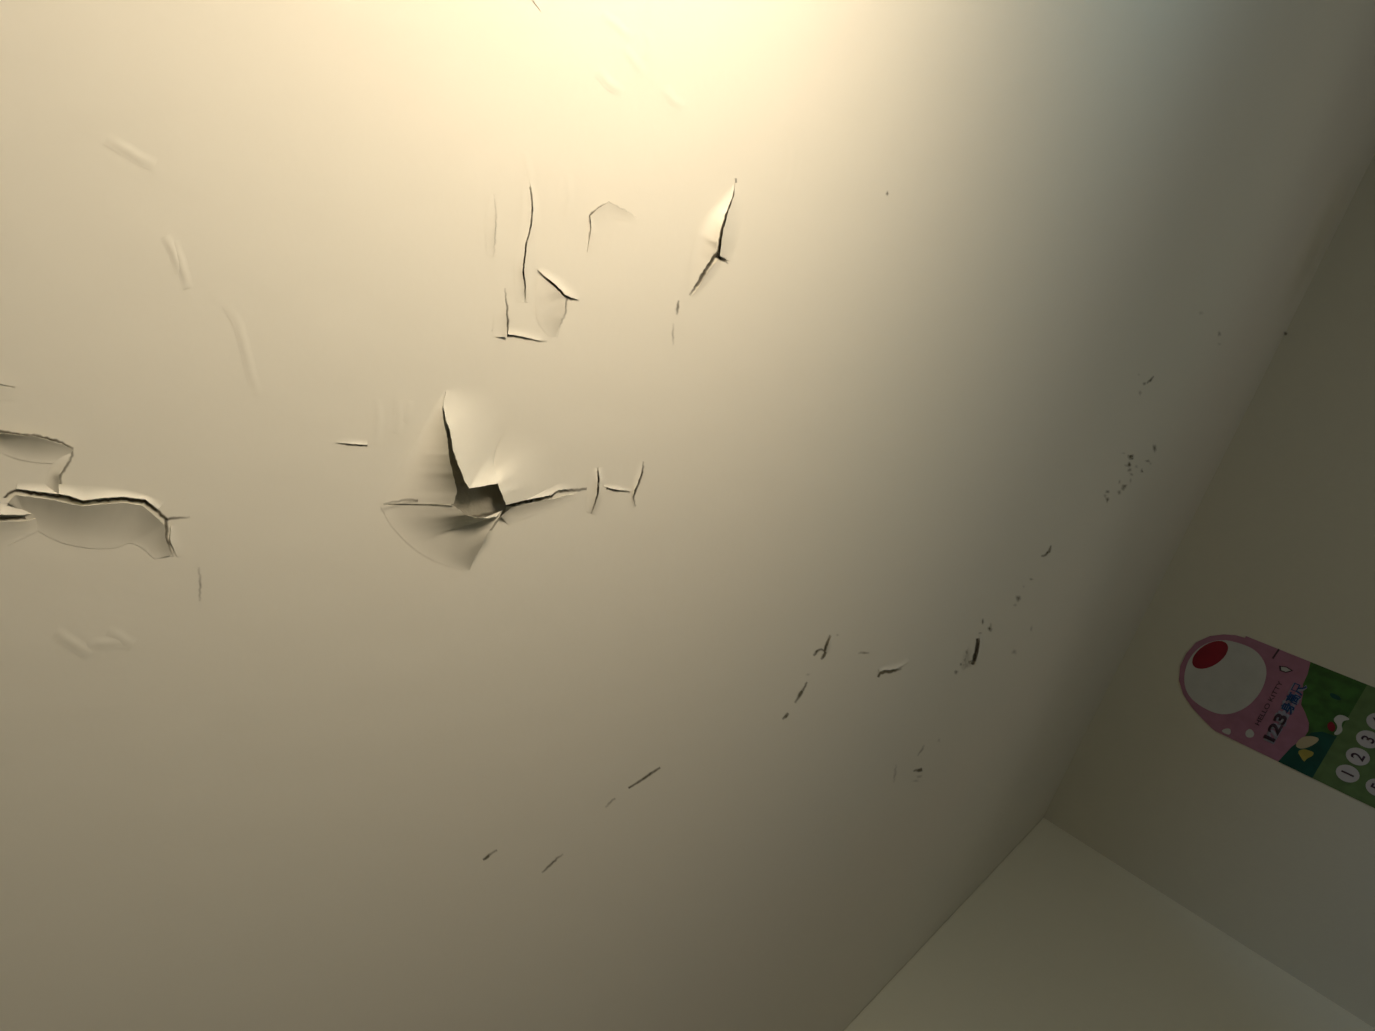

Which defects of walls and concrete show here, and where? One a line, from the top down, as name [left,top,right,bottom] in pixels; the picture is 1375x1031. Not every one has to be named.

crack [0,374,16,401]
peeling [0,430,185,559]
peeling [380,385,565,571]